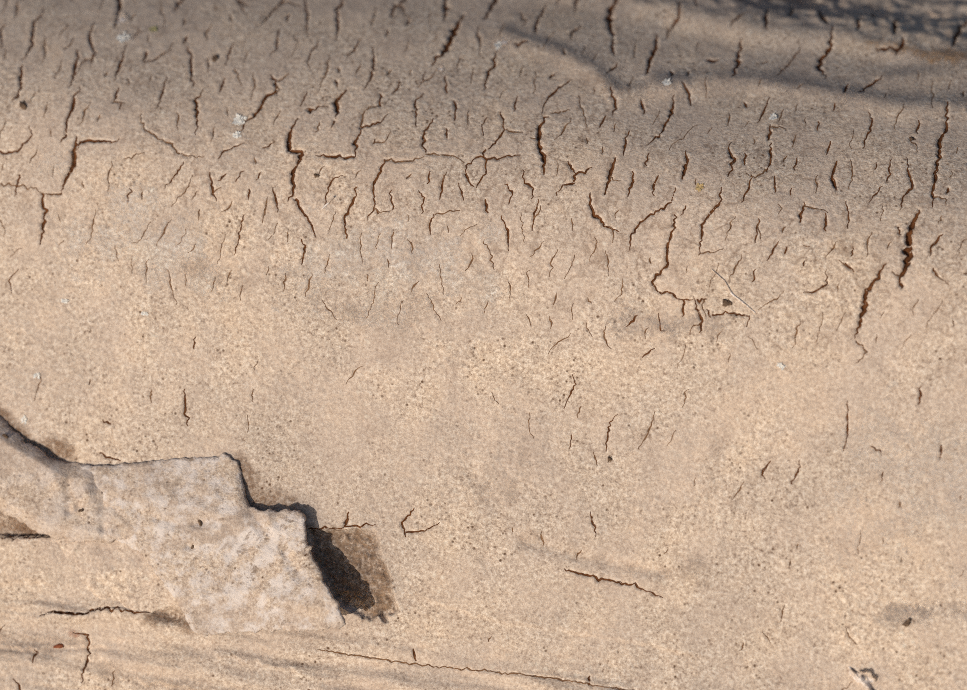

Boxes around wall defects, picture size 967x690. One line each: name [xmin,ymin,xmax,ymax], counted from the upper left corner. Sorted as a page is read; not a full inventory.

crack [0,0,967,369]
crack [182,389,190,426]
crack [563,375,581,449]
crack [593,414,618,465]
crack [638,411,676,450]
crack [842,401,850,451]
crack [732,460,771,500]
crack [564,512,663,598]
crack [319,649,625,690]
peeling [848,667,874,690]